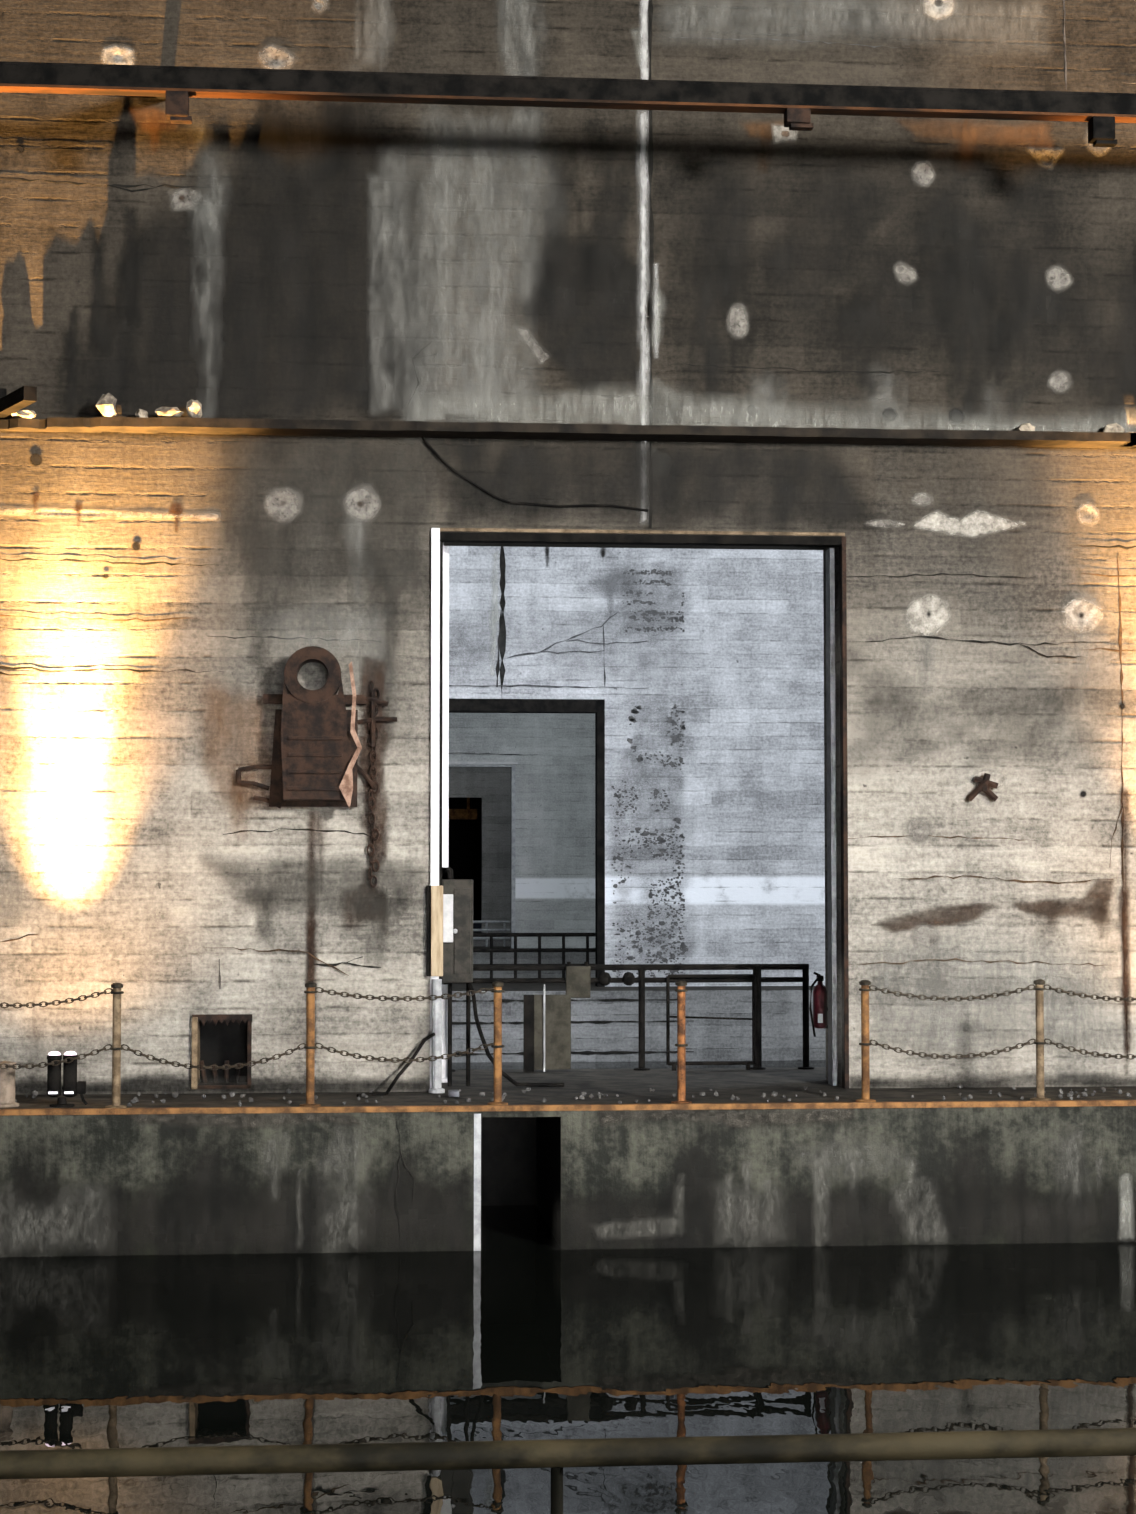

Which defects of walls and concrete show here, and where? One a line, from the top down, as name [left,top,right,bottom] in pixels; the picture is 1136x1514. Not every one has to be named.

water stain [66,101,531,422]
water stain [524,161,1136,431]
water stain [235,446,422,717]
water stain [219,863,414,937]
water stain [881,903,992,932]
water stain [1015,880,1112,922]
water stain [0,1147,470,1257]
water stain [562,1143,1136,1249]